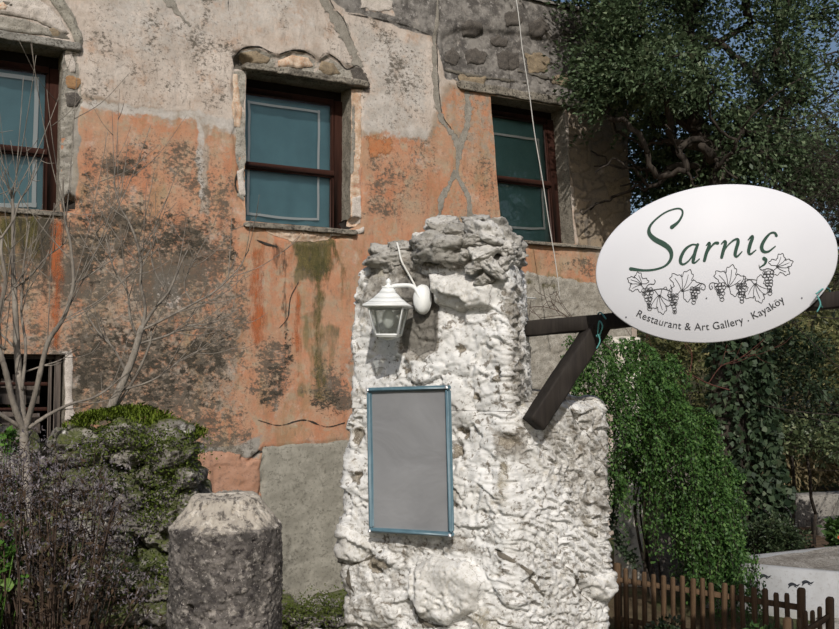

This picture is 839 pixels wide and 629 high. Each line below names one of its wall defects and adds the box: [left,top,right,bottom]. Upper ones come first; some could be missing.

crack [163,0,190,26]
spalling [462,19,483,38]
spalling [505,11,550,38]
spalling [444,34,582,85]
crack [320,0,473,217]
leakage [108,144,147,181]
leakage [65,202,236,286]
crack [281,282,299,326]
leakage [314,277,324,341]
leakage [257,325,295,404]
crack [258,419,345,427]